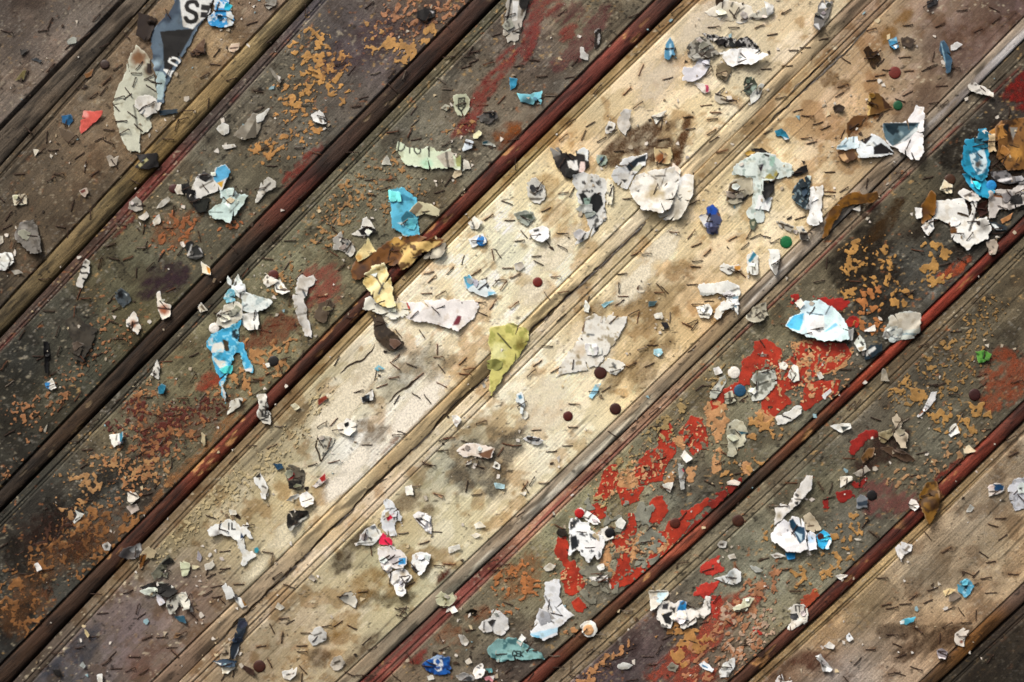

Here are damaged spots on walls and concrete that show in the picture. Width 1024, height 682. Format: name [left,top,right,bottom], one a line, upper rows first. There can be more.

peeling [248,0,466,173]
peeling [0,308,146,443]
peeling [0,337,298,638]
peeling [489,235,953,615]
peeling [655,477,868,682]
peeling [879,296,1009,491]